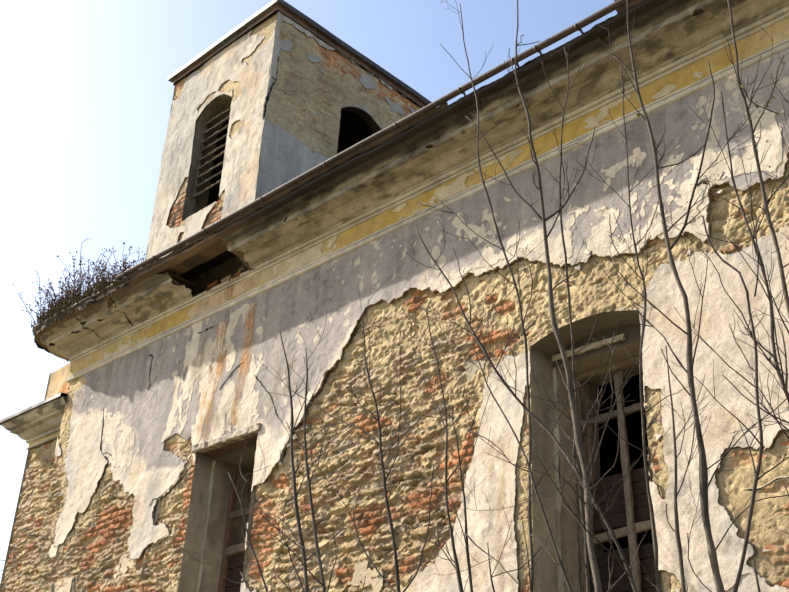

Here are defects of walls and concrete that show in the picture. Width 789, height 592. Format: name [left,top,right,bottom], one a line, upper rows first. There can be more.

spalling [173,66,203,100]
spalling [197,79,243,116]
spalling [242,13,421,158]
peeling [584,94,636,129]
spalling [166,175,189,243]
spalling [201,189,225,230]
spalling [198,267,255,295]
spalling [242,103,789,592]
spalling [0,302,269,592]